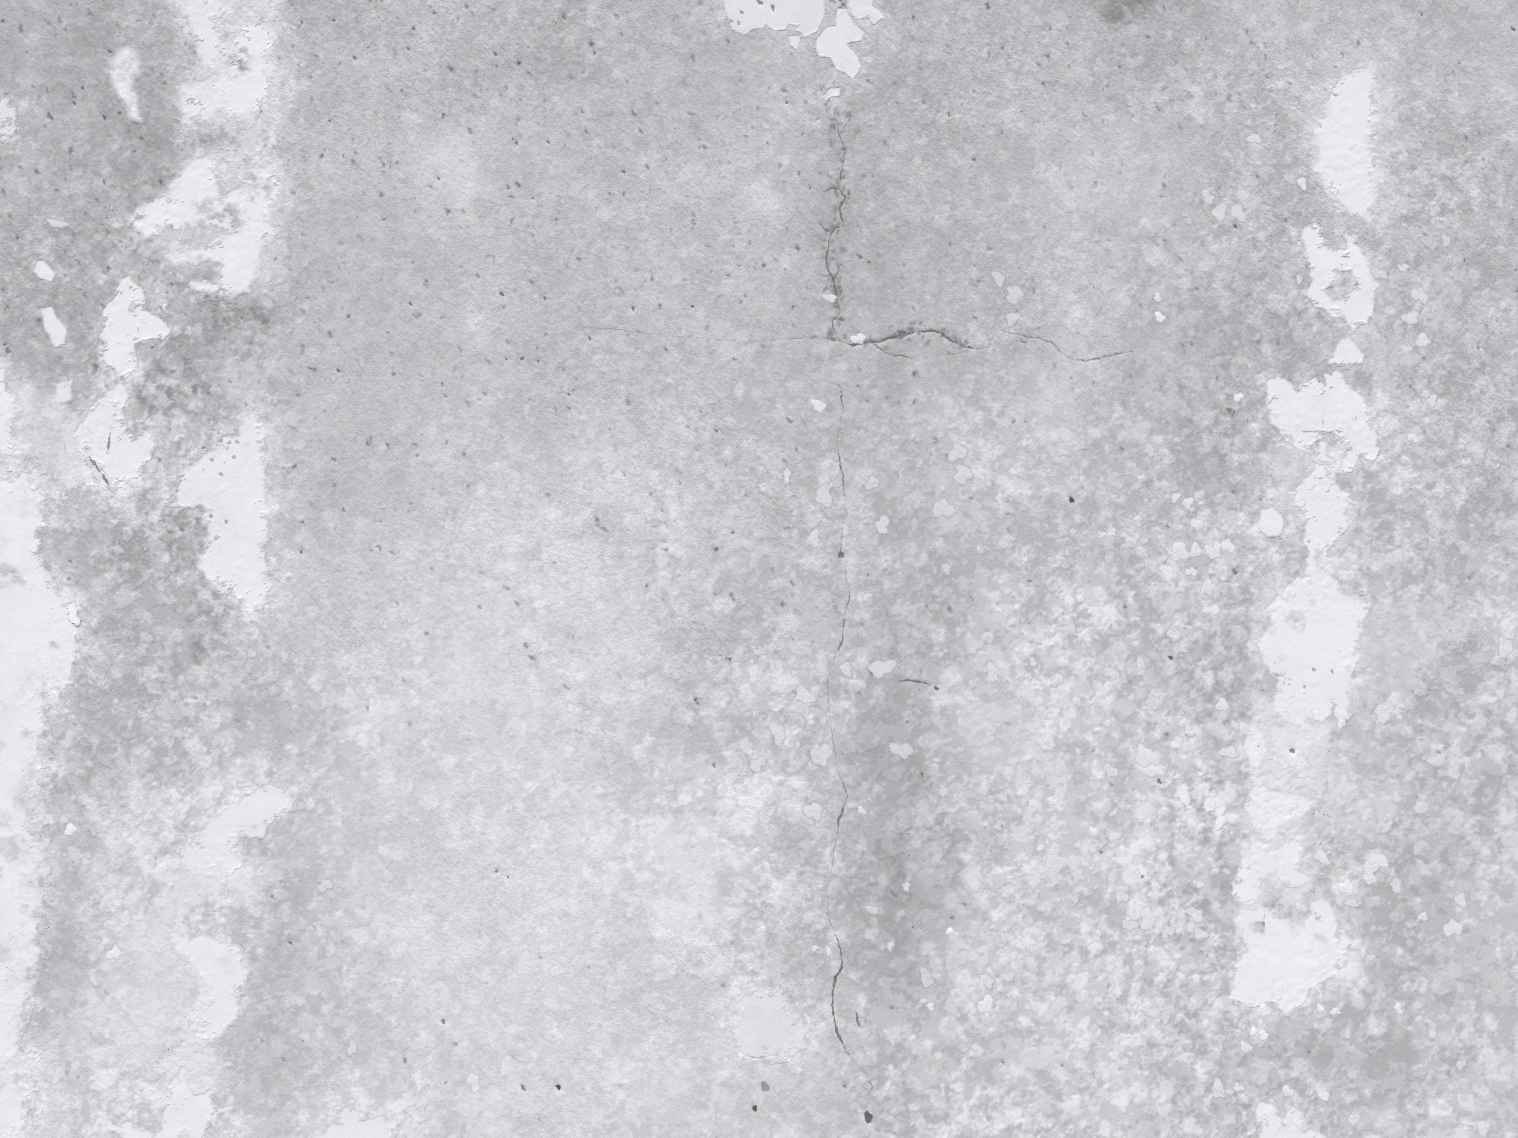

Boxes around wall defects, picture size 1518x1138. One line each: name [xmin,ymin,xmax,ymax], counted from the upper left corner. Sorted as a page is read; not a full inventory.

peeling [32,258,57,281]
peeling [38,304,68,347]
peeling [53,274,172,490]
peeling [124,0,286,301]
peeling [722,0,885,101]
crack [791,112,1121,362]
peeling [168,406,273,614]
peeling [1157,56,1388,1016]
peeling [0,359,82,1138]
crack [828,903,860,1053]
peeling [105,1062,233,1138]
peeling [1254,1100,1332,1138]